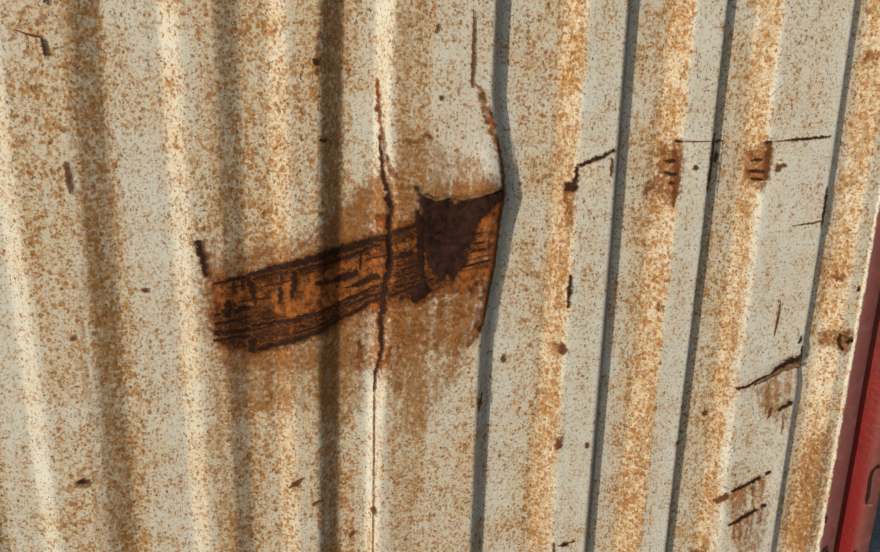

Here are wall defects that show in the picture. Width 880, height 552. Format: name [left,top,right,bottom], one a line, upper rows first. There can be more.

corrosion [312,0,343,233]
crack [466,9,506,348]
corrosion [644,140,698,207]
corrosion [742,144,786,190]
corrosion [374,213,386,227]
crack [372,134,396,552]
corrosion [818,330,854,357]
corrosion [757,372,796,433]
corrosion [713,475,765,552]